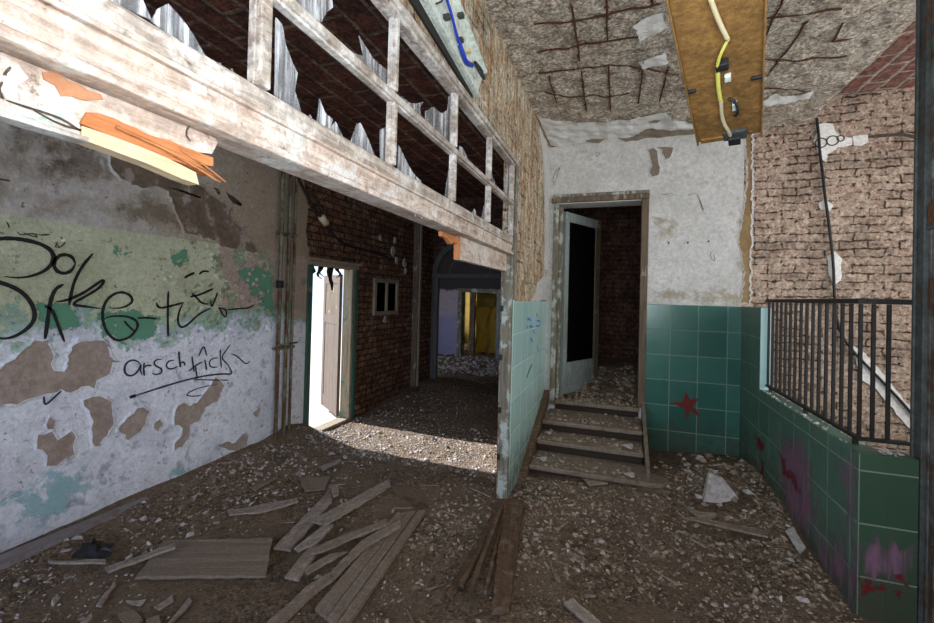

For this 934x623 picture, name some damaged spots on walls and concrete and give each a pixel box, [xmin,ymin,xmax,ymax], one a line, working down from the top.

peeling [534,0,694,178]
peeling [763,88,814,106]
peeling [107,155,272,352]
spalling [0,336,227,469]
spalling [216,432,250,452]